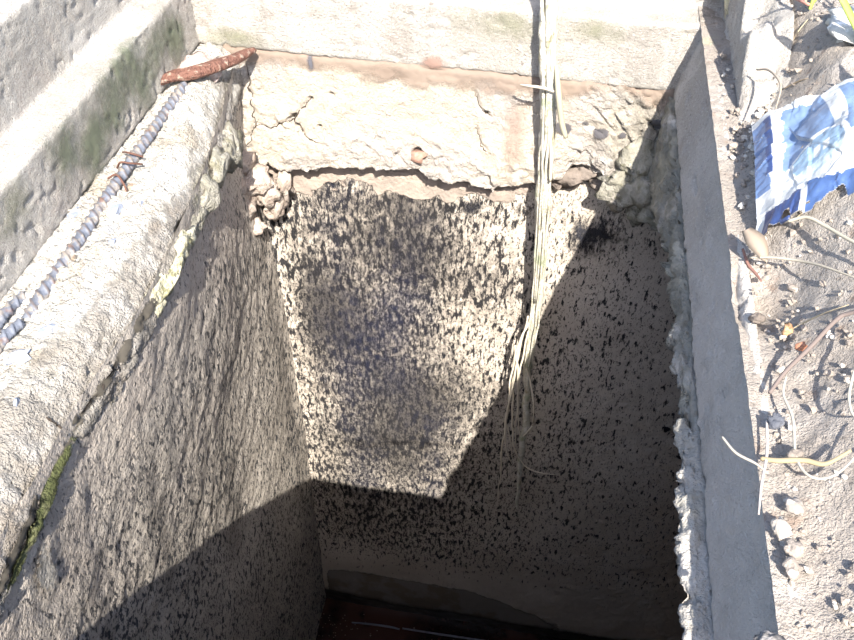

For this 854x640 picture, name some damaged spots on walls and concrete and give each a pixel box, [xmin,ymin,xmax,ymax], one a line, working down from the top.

spalling [190,41,231,59]
crack [246,65,317,147]
spalling [551,85,666,191]
spalling [0,58,540,407]
leakage [567,213,628,261]
leakage [294,184,485,495]
peeling [36,545,58,599]